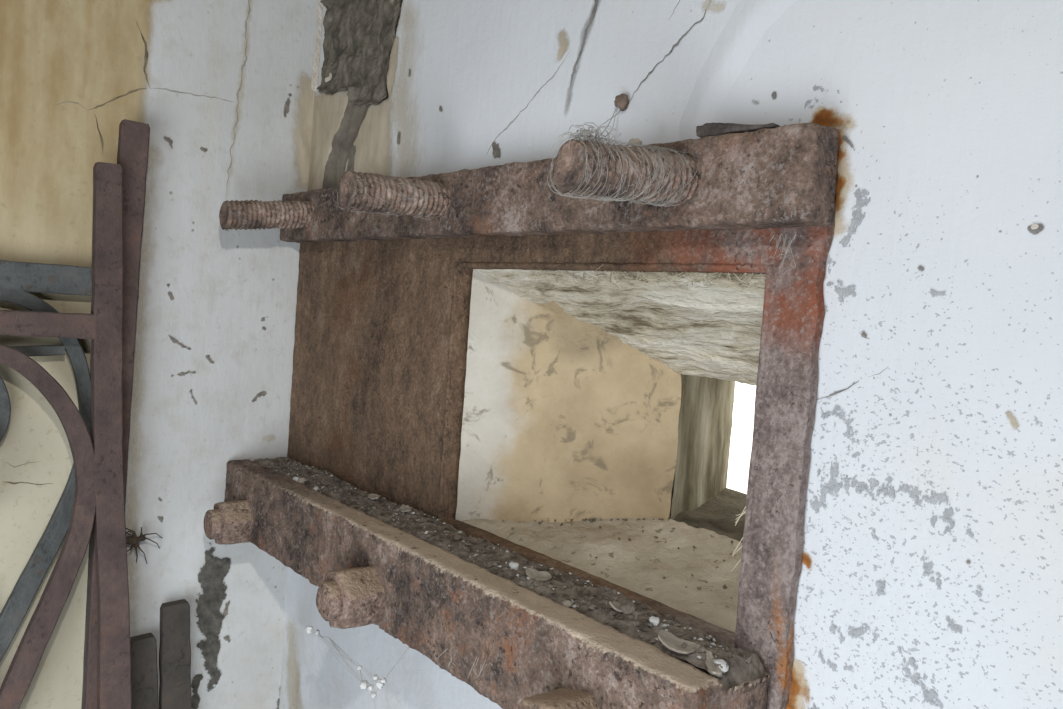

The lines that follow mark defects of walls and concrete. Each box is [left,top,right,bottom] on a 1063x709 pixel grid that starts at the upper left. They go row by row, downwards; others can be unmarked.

rust [786,661,809,709]